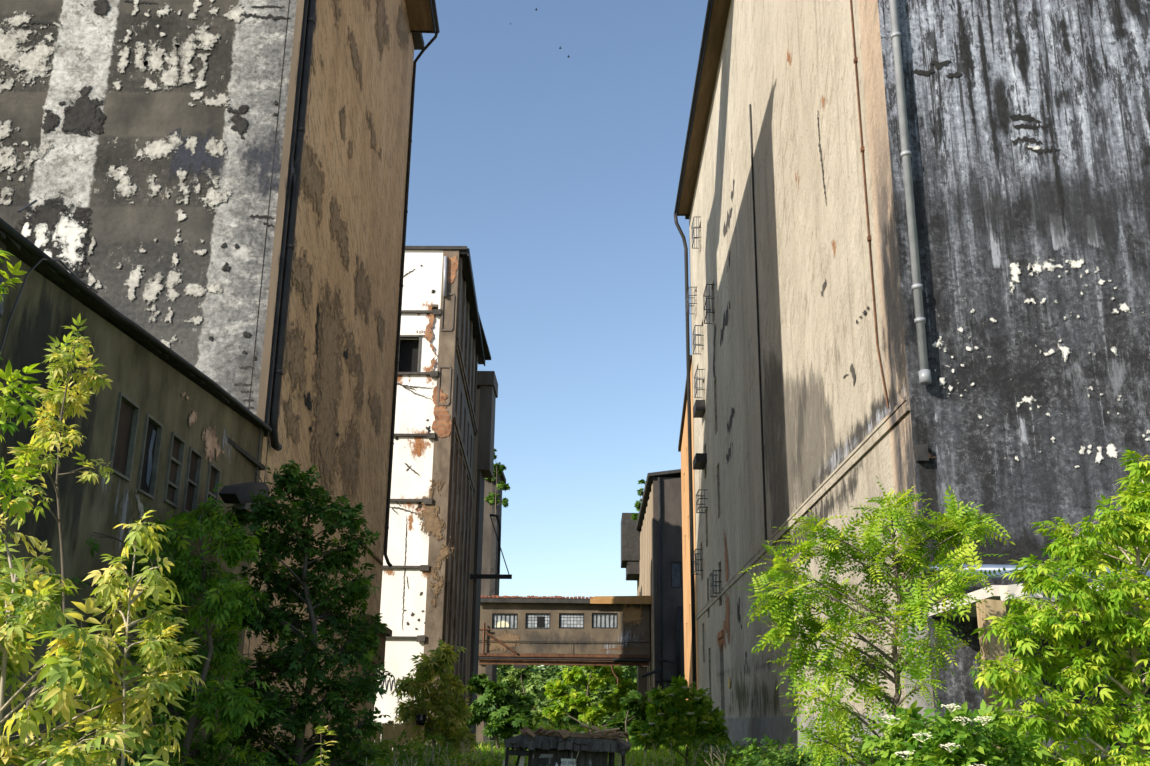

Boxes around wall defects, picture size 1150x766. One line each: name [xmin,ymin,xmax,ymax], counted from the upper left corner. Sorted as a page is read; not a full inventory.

peeling [363,0,411,61]
spalling [0,0,249,290]
water stain [920,106,942,145]
water stain [946,0,1150,267]
peeling [106,131,232,348]
peeling [1009,257,1132,314]
peeling [283,136,385,507]
peeling [933,336,975,397]
peeling [1035,339,1072,362]
peeling [182,392,225,463]
peeling [1016,395,1051,417]
peeling [1075,443,1118,468]